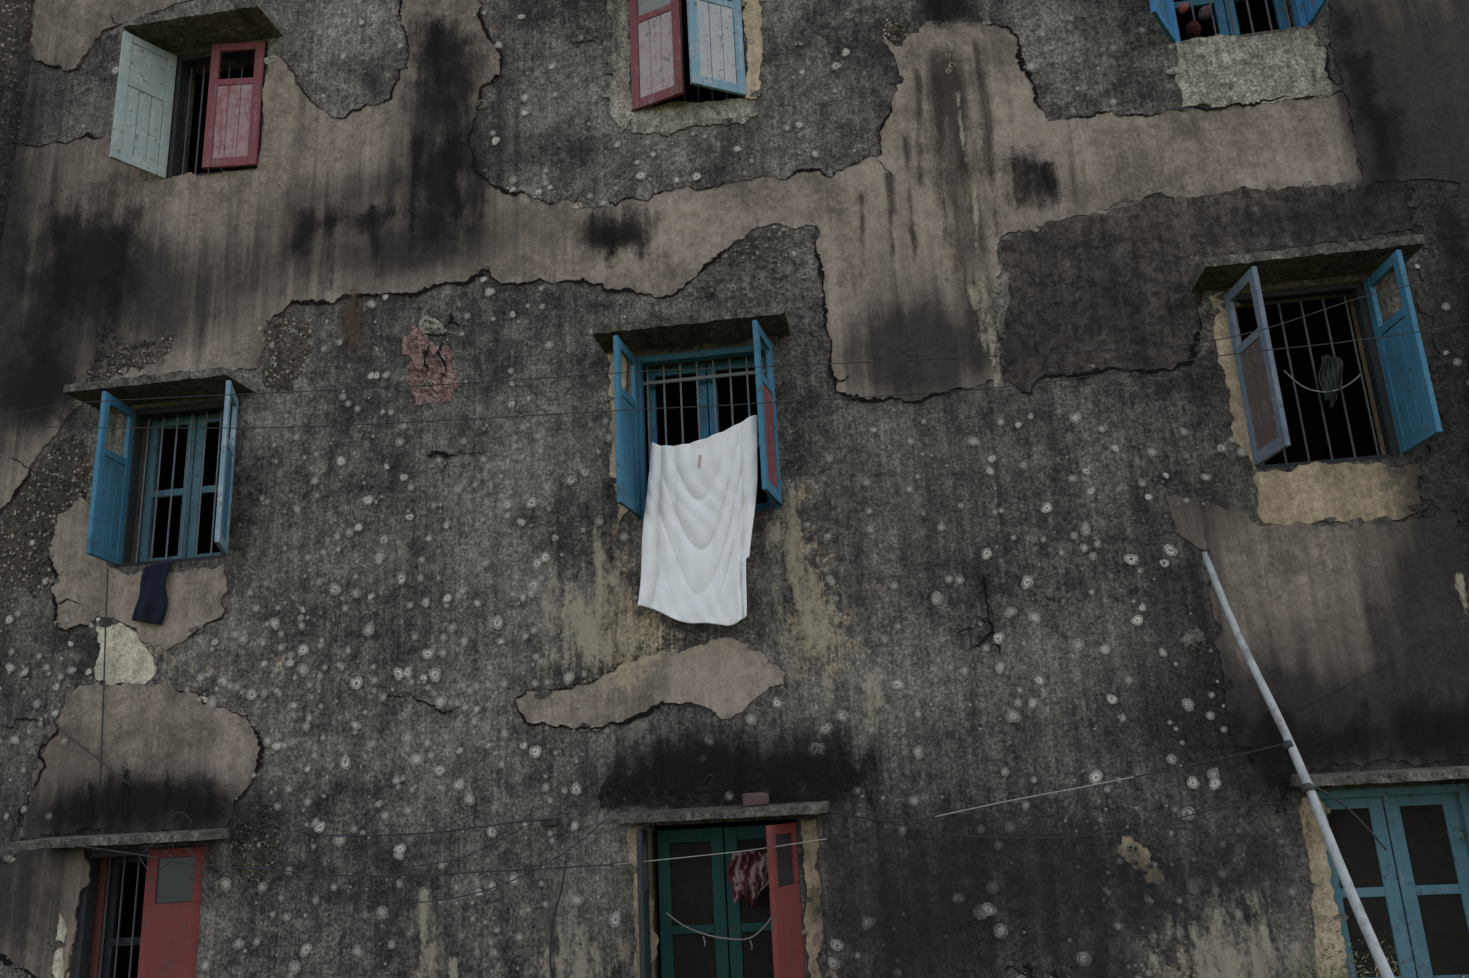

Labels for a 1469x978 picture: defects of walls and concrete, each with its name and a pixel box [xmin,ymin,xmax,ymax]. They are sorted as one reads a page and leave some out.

damp [288,11,486,287]
peeling [0,0,1367,522]
damp [885,42,1059,387]
peeling [1327,0,1469,187]
peeling [999,181,1469,771]
peeling [0,434,281,882]
spalling [515,637,785,732]
damp [1266,711,1277,749]
damp [1455,574,1467,607]
peeling [0,847,91,978]
crack [1005,959,1059,978]
damp [1150,895,1309,978]